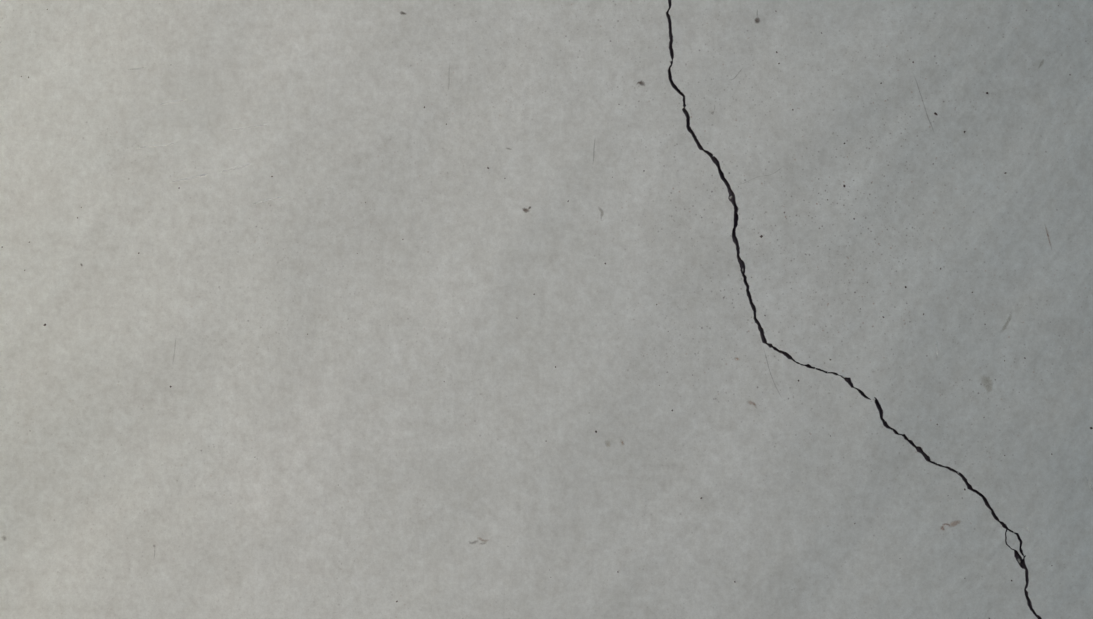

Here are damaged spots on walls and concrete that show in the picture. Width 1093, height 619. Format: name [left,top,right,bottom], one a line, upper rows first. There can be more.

crack [666,0,1042,619]